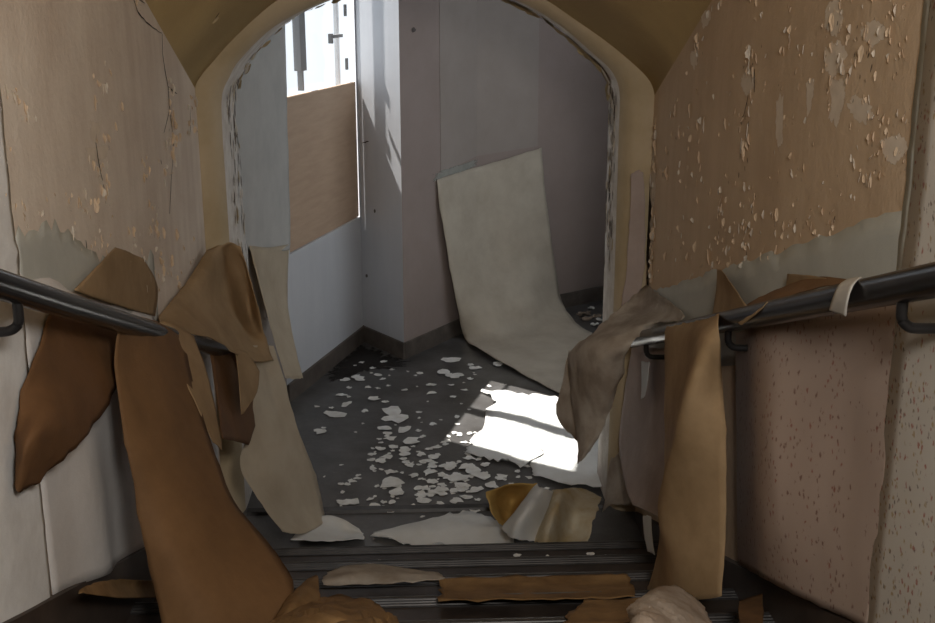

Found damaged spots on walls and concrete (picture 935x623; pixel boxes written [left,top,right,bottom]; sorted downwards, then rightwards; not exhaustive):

peeling [648,0,930,328]
peeling [15,193,134,313]
peeling [719,330,742,366]